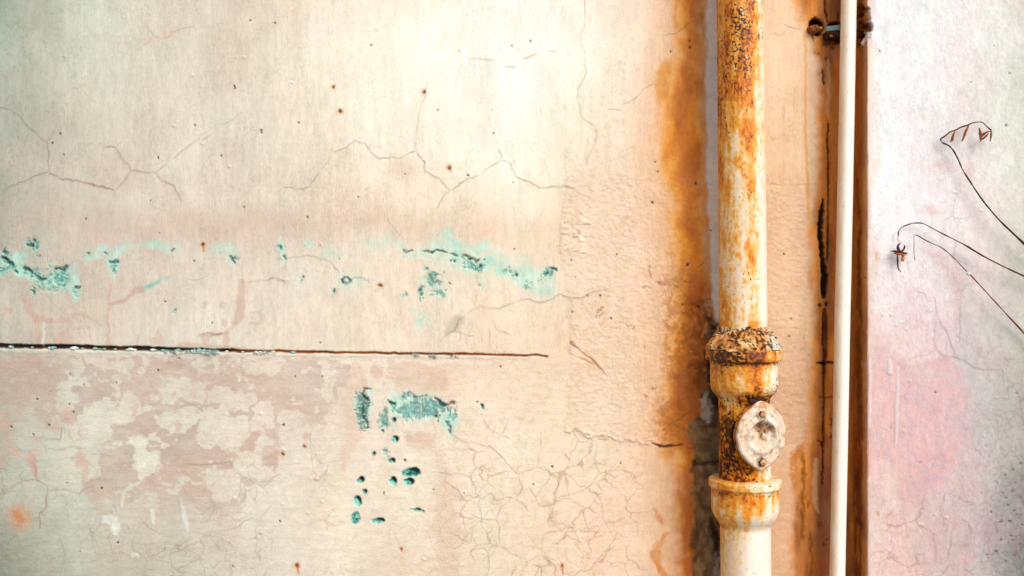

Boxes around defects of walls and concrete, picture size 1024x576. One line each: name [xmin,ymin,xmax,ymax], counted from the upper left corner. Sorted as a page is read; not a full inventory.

crack [283,0,653,209]
crack [0,106,243,203]
peeling [0,232,242,306]
crack [0,273,611,360]
peeling [329,258,366,298]
peeling [394,225,576,339]
rust [618,0,712,576]
peeling [126,431,164,481]
peeling [350,385,461,462]
crack [451,418,638,576]
leakage [682,304,721,576]
rust [738,396,769,404]